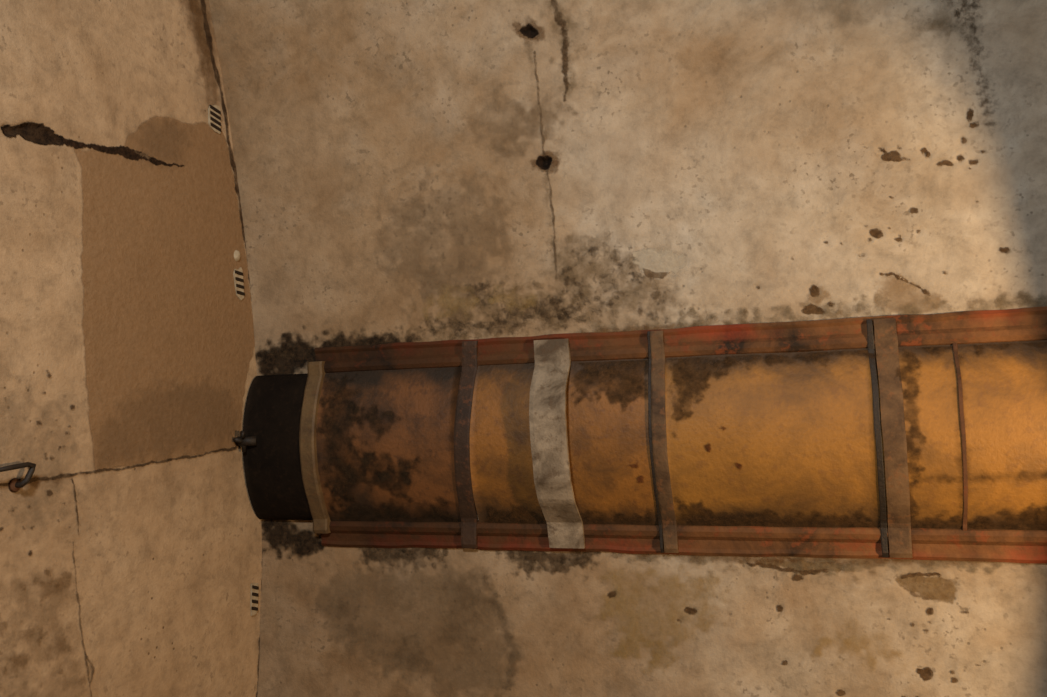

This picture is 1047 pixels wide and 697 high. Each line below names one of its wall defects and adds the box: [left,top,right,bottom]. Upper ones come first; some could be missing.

crack [1,122,184,167]
crack [534,0,569,264]
water stain [74,116,418,470]
water stain [432,249,659,338]
crack [77,594,94,696]